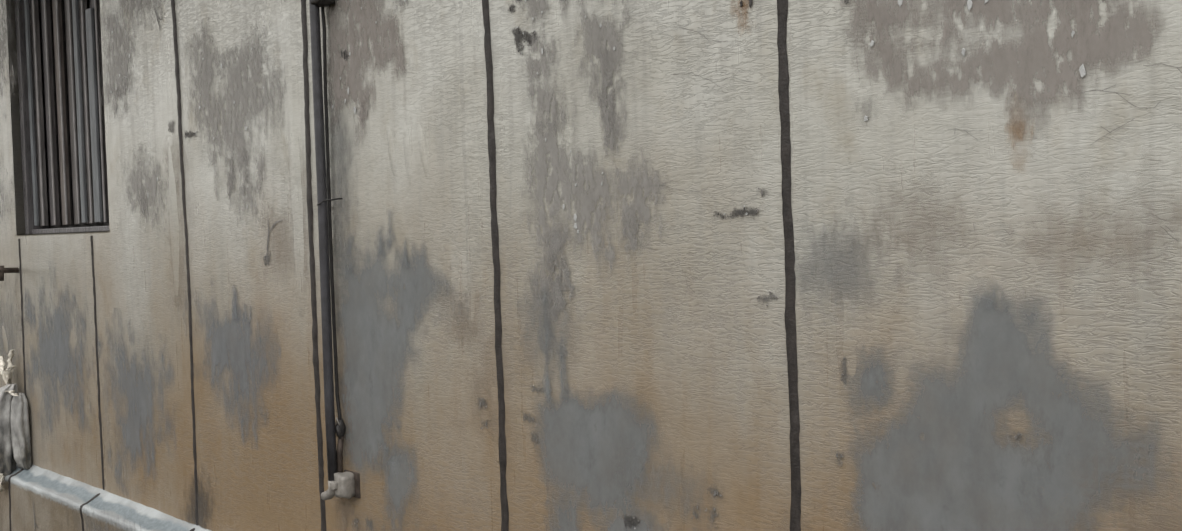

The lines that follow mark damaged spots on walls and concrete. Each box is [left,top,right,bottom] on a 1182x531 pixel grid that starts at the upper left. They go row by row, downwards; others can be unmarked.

peeling [844,0,1156,110]
leakage [339,229,447,518]
leakage [539,328,654,531]
leakage [856,293,1154,531]